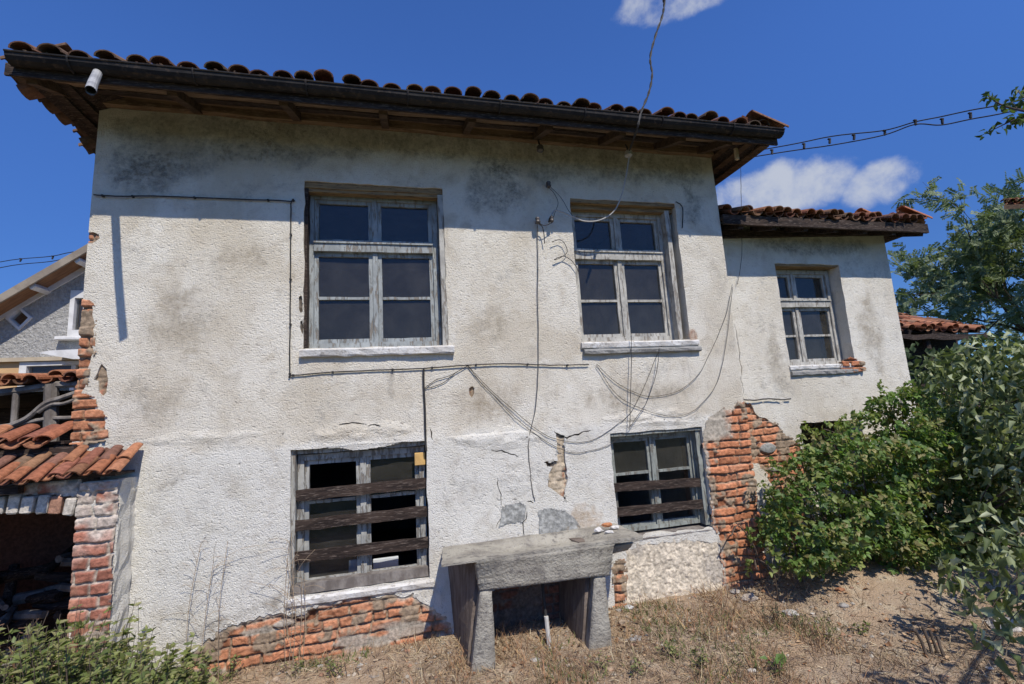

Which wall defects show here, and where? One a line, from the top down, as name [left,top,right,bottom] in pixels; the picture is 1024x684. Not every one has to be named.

spalling [69,299,109,445]
spalling [546,433,567,502]
spalling [611,401,820,607]
spalling [176,592,453,678]